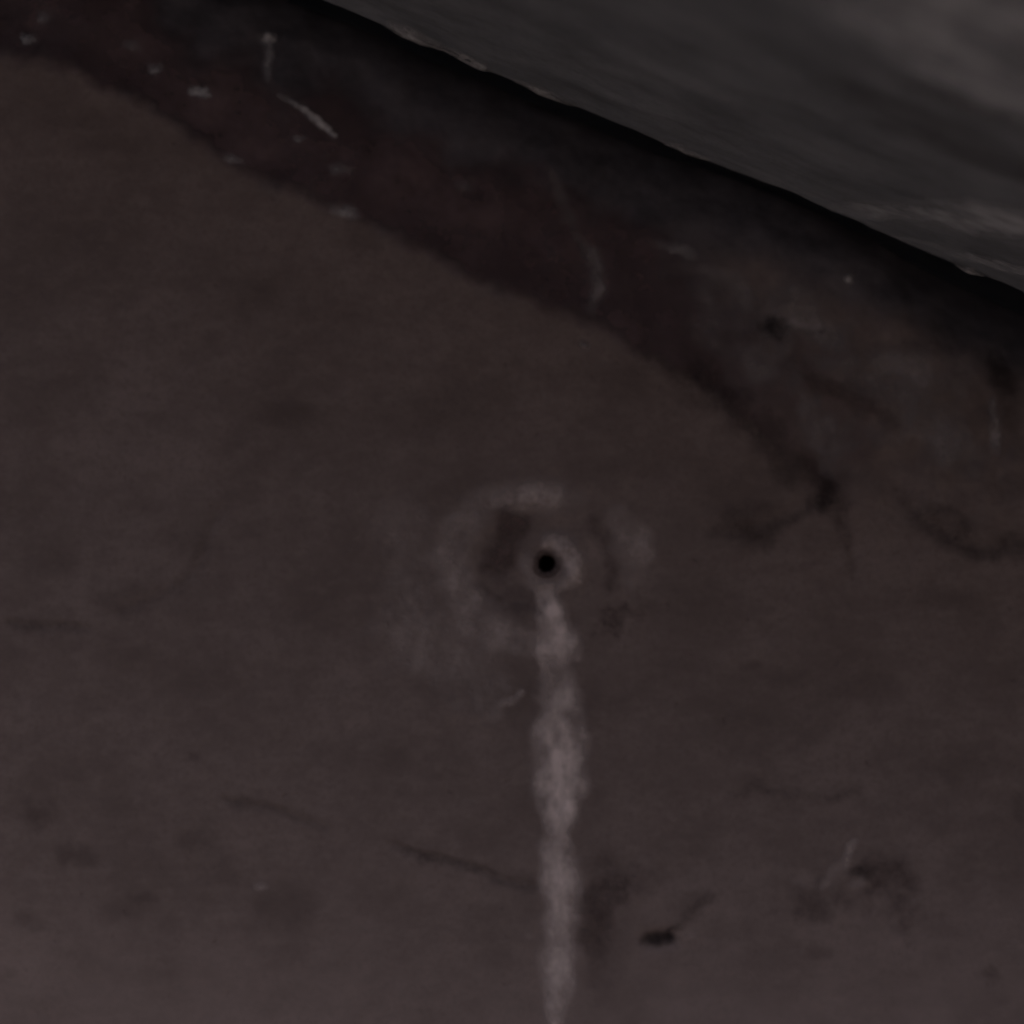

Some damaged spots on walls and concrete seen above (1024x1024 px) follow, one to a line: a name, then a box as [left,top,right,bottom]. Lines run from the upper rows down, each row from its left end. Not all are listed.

water stain [536,534,583,663]
water stain [536,687,584,1009]